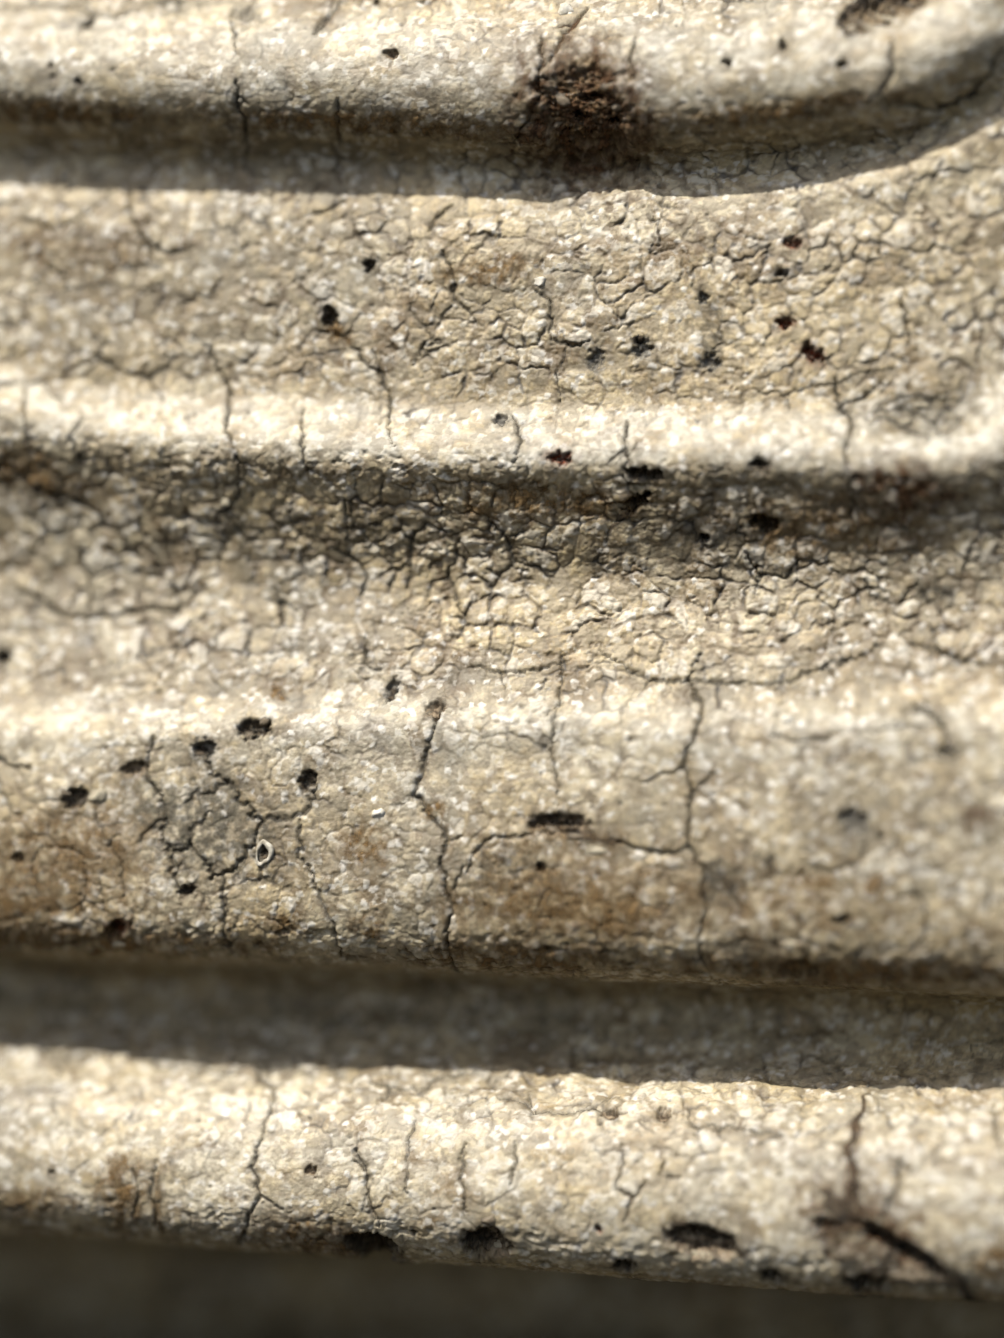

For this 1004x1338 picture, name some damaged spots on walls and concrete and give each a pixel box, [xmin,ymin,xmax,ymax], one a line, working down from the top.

crack [520,10,588,128]
rust [506,54,653,187]
spalling [837,0,926,35]
crack [340,303,442,447]
crack [611,424,637,461]
crack [758,368,902,530]
crack [329,500,550,617]
crack [747,553,824,594]
crack [32,738,342,956]
crack [414,708,527,971]
crack [601,637,1004,961]
crack [239,1082,283,1243]